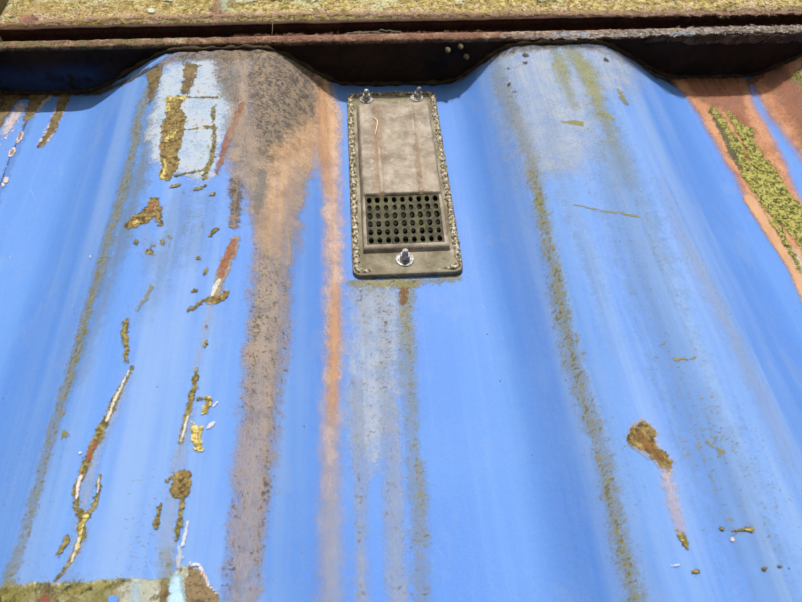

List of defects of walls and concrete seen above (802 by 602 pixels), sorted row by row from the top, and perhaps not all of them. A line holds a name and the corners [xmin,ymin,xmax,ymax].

peeling [505,24,802,39]
peeling [144,58,235,195]
rust [672,56,802,301]
rust [0,49,342,602]
peeling [186,288,230,312]
rust [627,421,675,500]
peeling [19,562,220,602]